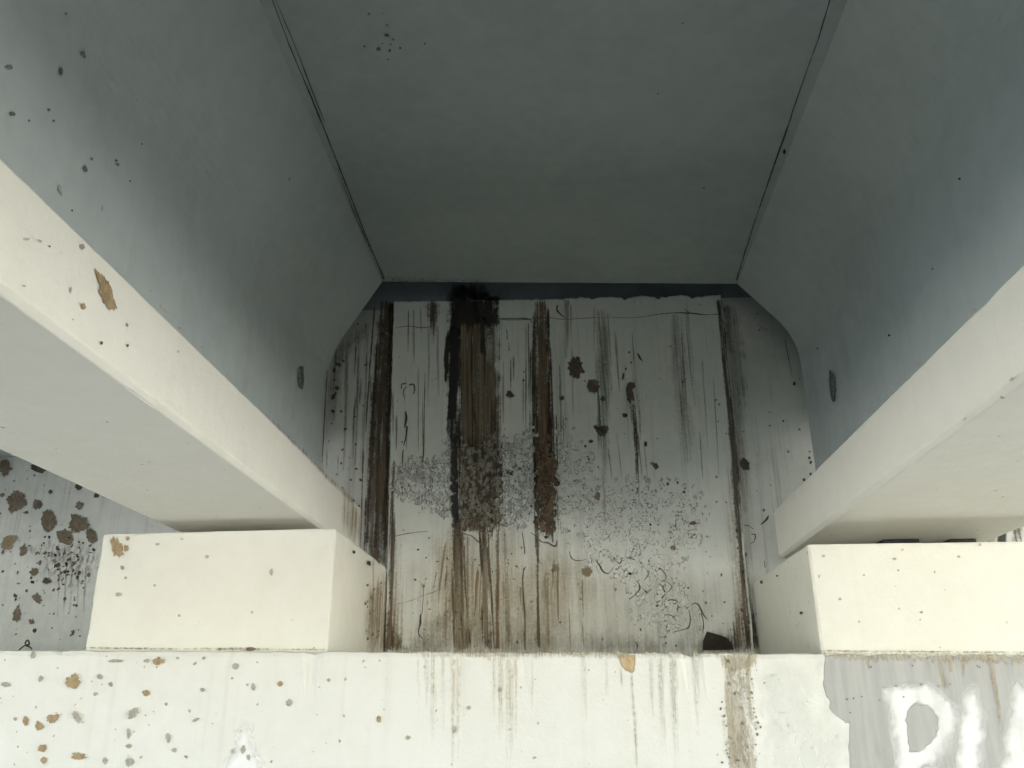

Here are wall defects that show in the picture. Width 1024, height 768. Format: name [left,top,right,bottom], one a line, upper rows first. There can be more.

spalling [95,269,117,310]
rust [344,301,394,562]
rust [439,321,510,649]
rust [524,301,559,648]
peeling [390,414,703,644]
damp [717,300,758,649]